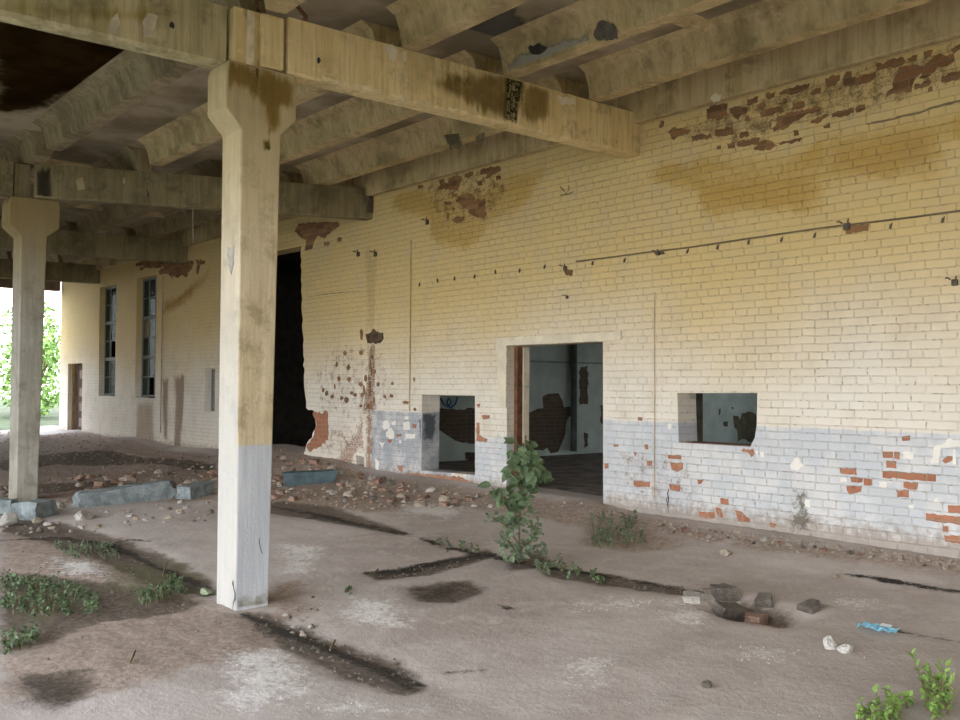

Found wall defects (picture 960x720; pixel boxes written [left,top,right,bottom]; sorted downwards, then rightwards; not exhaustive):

leakage [0,22,124,112]
flaking render [659,44,960,151]
flaking render [418,166,504,223]
flaking render [295,221,342,251]
spalling [359,329,384,355]
corrosion [364,346,375,412]
spalling [322,351,417,449]
flaking render [306,410,347,452]
flaking render [667,455,683,472]
flaking render [839,435,960,509]
flaking render [699,498,750,523]
flaking render [926,497,960,544]